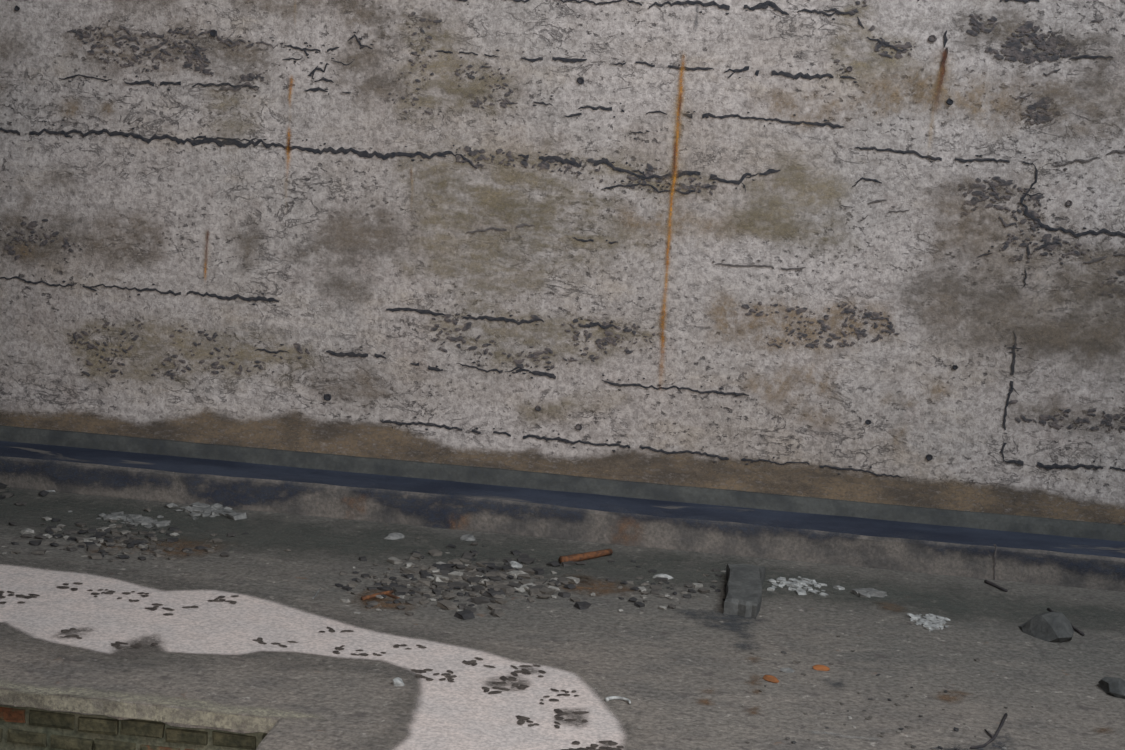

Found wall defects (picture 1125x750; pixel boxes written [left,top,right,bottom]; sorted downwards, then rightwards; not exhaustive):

crack [557,0,909,52]
corrosion [937,52,947,95]
crack [0,120,479,169]
corrosion [665,64,684,287]
crack [0,275,279,305]
crack [386,302,544,325]
damp [916,271,1125,356]
crack [326,346,556,379]
crack [1000,333,1125,472]
damp [0,410,1125,525]
damp [0,458,728,585]
damp [762,571,1125,627]